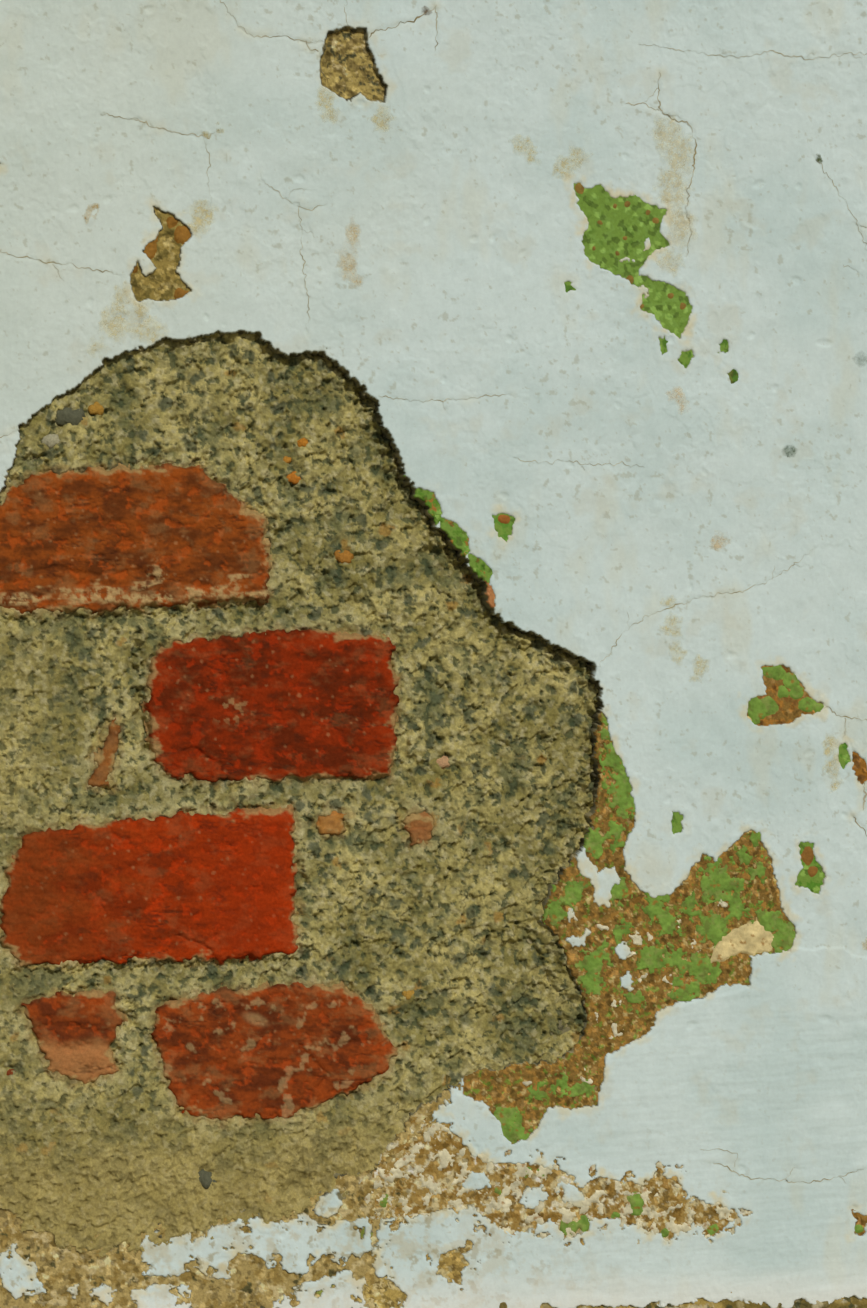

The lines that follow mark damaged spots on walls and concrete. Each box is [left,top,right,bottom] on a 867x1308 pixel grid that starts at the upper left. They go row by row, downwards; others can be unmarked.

crack [220,1,319,52]
peeling [321,29,385,101]
crack [344,6,438,51]
crack [104,113,213,197]
crack [626,44,866,255]
crack [2,252,125,279]
peeling [130,207,191,301]
crack [268,185,322,324]
peeling [574,183,693,368]
peeling [747,665,824,726]
flaking render [0,332,796,1308]
peeling [795,842,825,894]